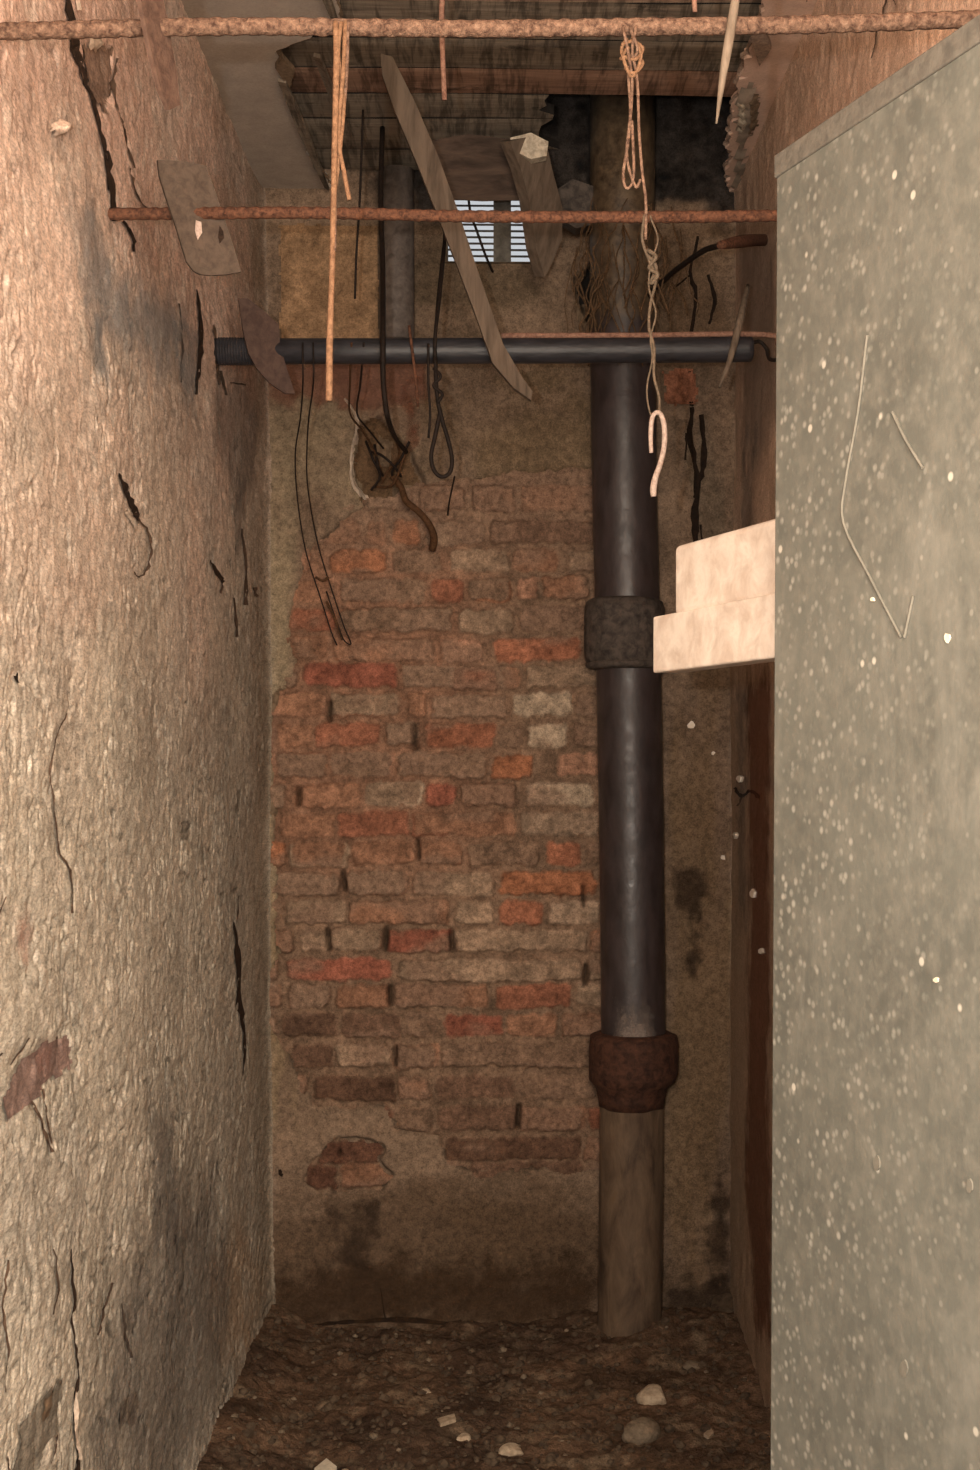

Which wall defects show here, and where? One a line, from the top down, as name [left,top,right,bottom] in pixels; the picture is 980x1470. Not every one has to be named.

spalling [0,18,144,116]
crack [65,0,147,252]
spalling [160,0,980,189]
spalling [193,206,777,224]
crack [118,473,153,578]
crack [210,529,259,637]
flaking render [269,398,601,1179]
crack [233,896,246,1073]
flaking render [3,1035,72,1121]
crack [31,1089,55,1153]
flaking render [304,1137,393,1192]
crack [51,1249,133,1470]